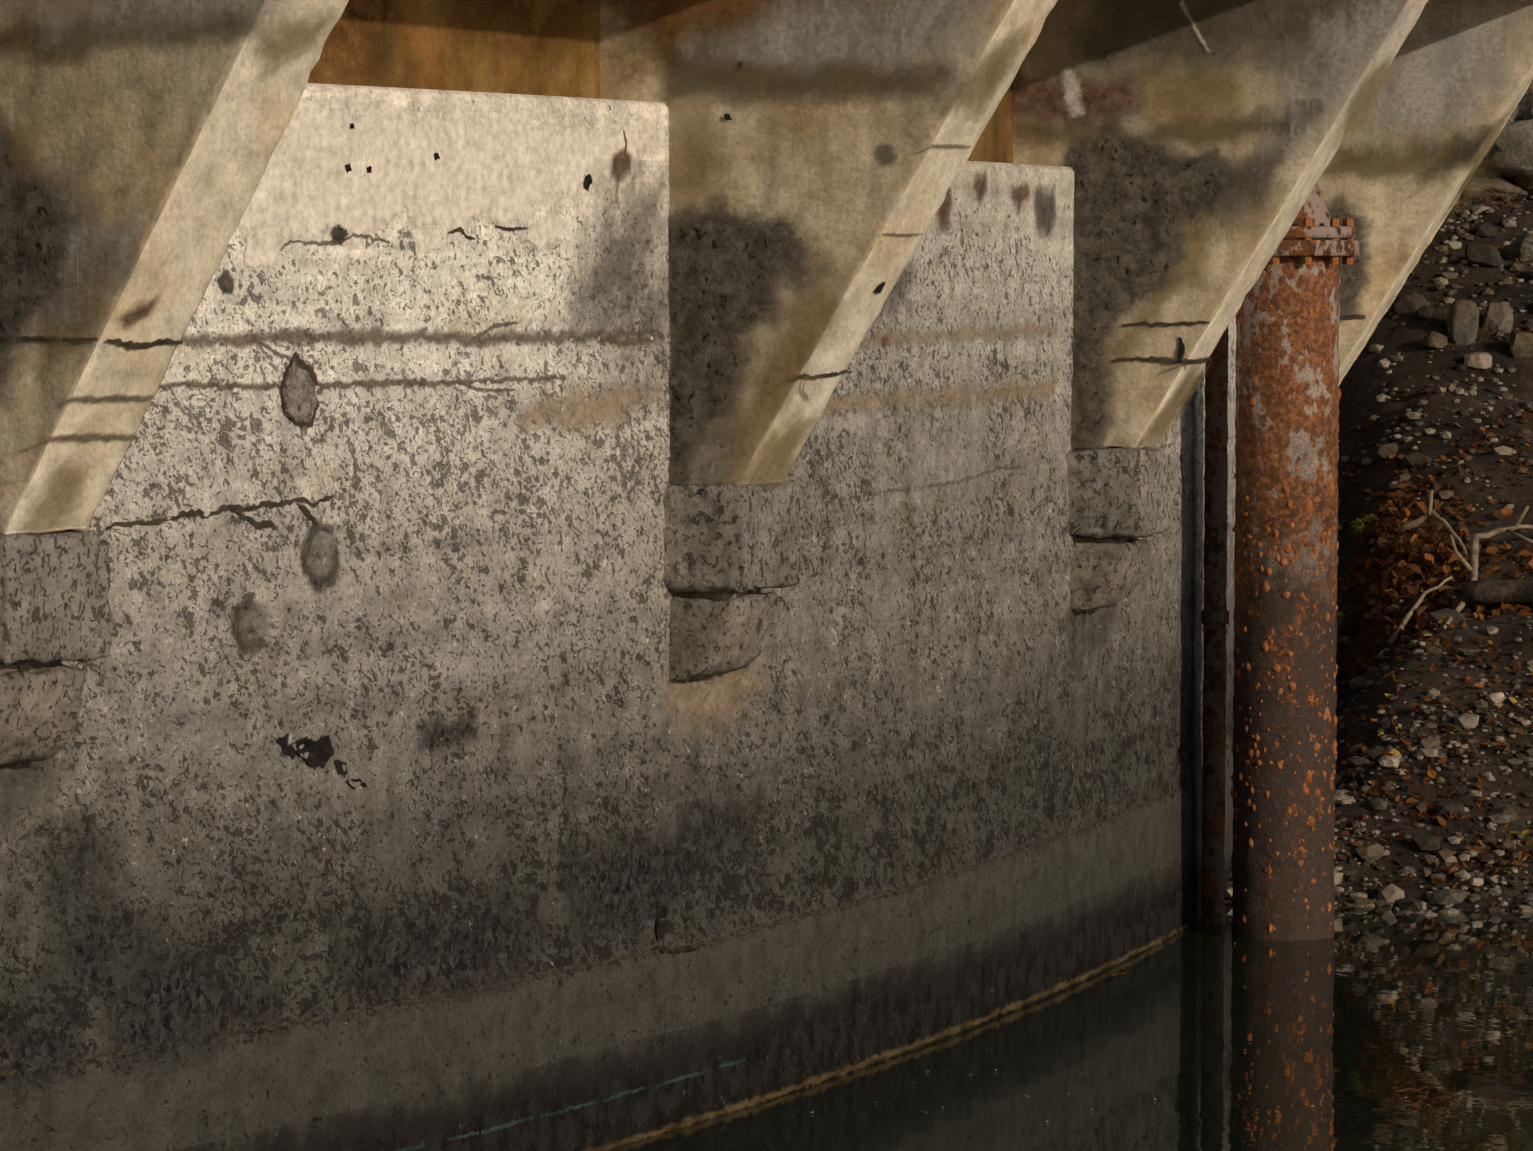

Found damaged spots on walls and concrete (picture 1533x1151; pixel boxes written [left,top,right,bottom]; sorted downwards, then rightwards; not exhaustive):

rust [1346,59,1391,135]
rust [939,188,952,230]
rust [975,175,987,200]
rust [1013,184,1030,212]
crack [279,233,390,252]
crack [448,226,528,240]
leakage [54,214,138,321]
crack [1112,320,1213,364]
crack [19,321,661,442]
crack [106,495,334,532]
spalling [275,733,367,790]